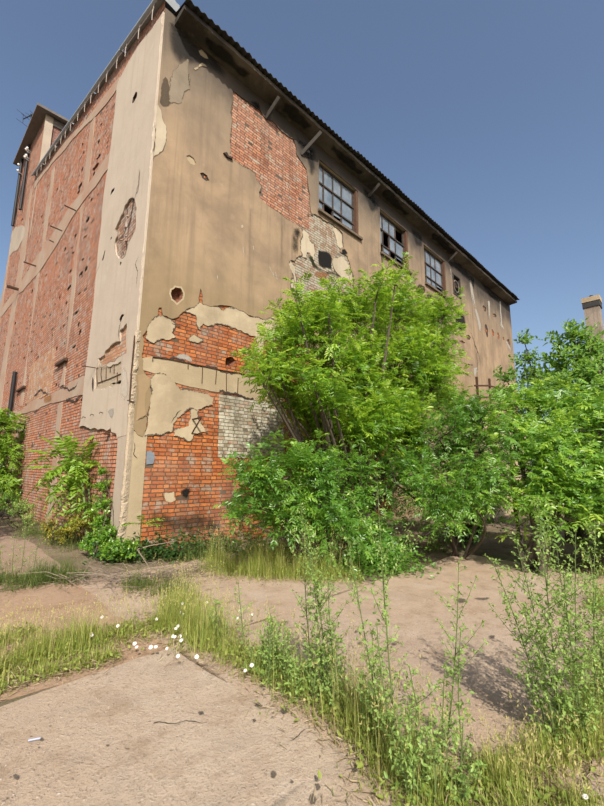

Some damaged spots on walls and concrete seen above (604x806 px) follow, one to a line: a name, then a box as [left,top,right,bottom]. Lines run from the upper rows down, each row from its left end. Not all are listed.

flaking render [153,49,208,158]
flaking render [110,198,137,265]
flaking render [223,91,355,302]
spalling [171,288,182,303]
flaking render [92,302,301,542]